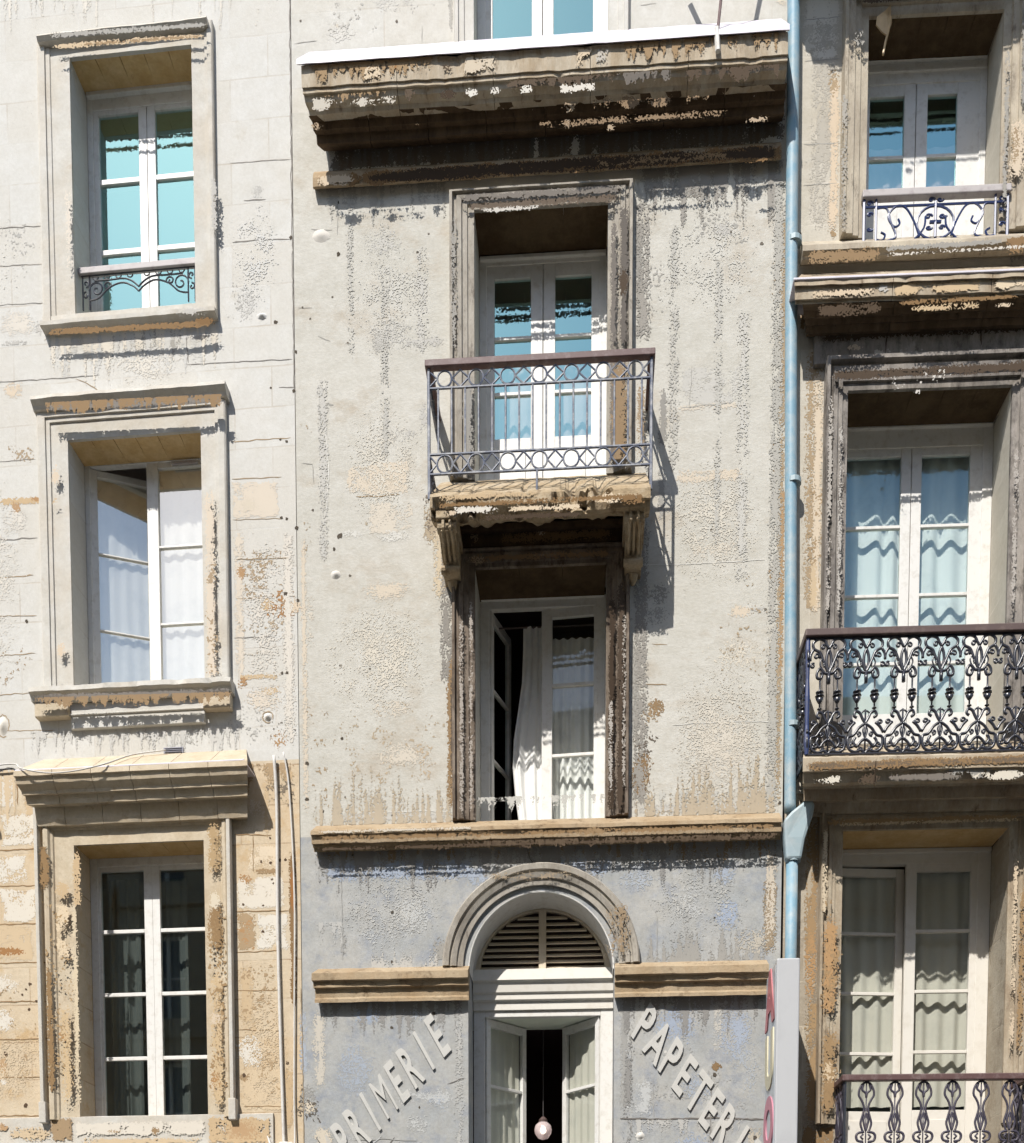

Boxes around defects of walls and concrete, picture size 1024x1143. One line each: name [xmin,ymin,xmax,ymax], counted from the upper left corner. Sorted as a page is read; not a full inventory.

leakage [451,151,769,202]
leakage [658,212,770,618]
leakage [336,840,778,958]